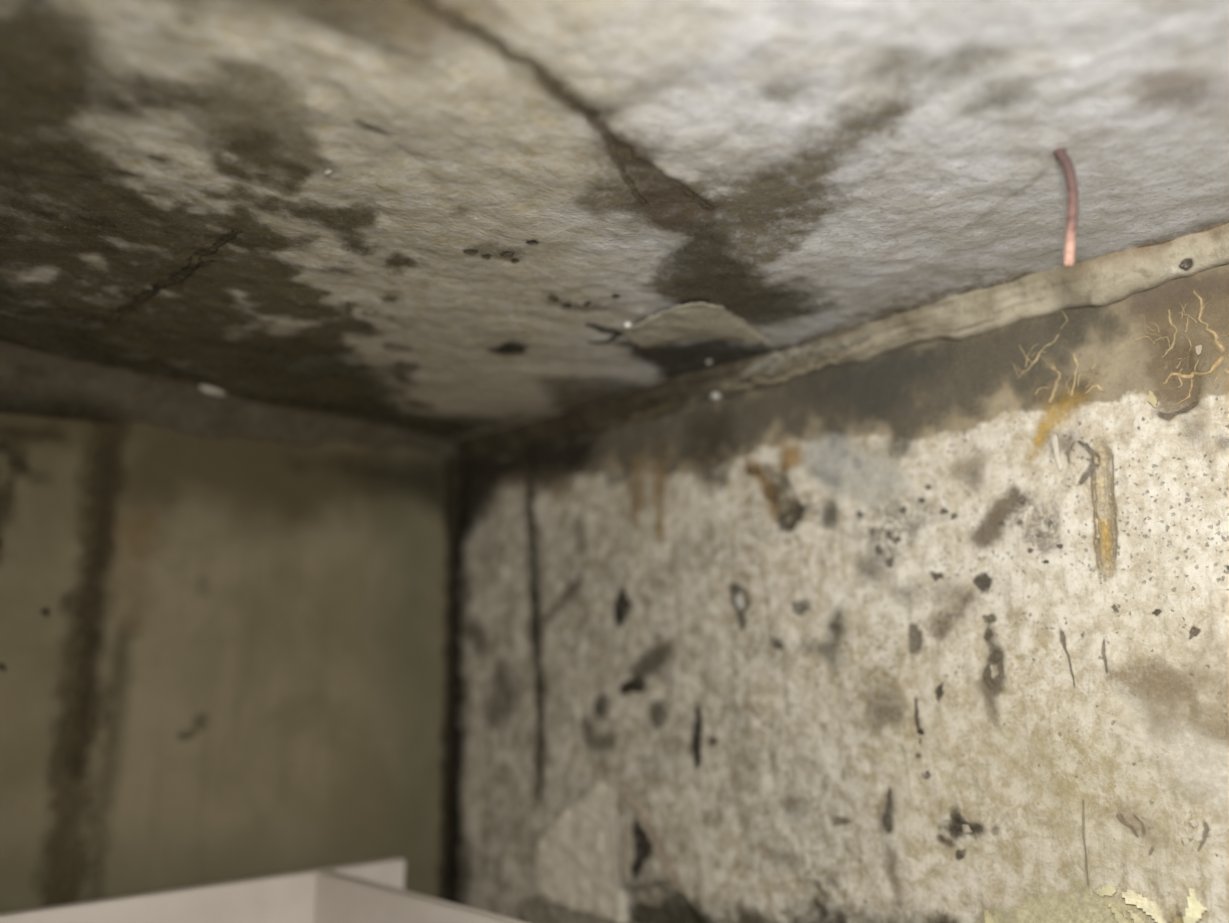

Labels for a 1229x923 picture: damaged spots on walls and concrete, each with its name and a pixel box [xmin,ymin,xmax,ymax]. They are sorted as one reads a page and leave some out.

water stain [0,0,505,442]
crack [413,0,716,209]
water stain [577,101,910,325]
water stain [456,306,1113,556]
water stain [0,406,125,907]
peeling [983,885,1207,923]